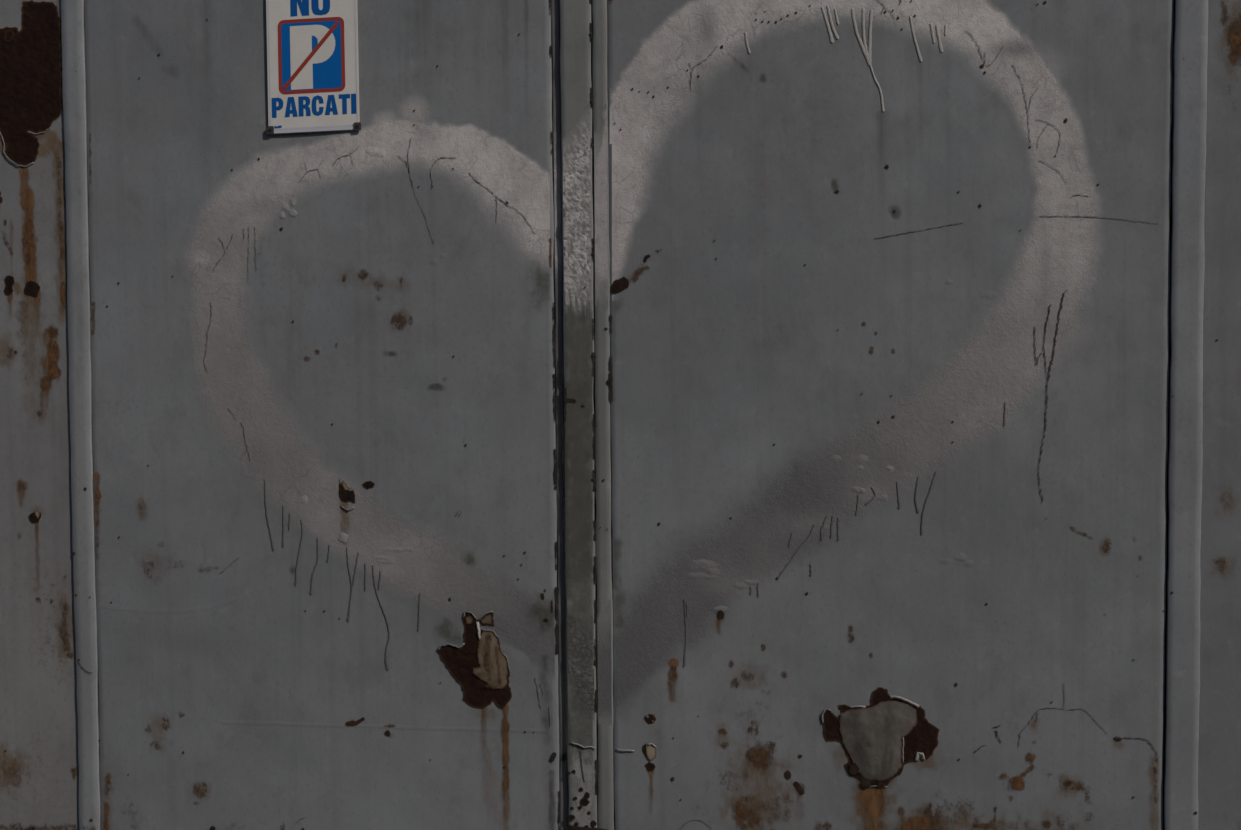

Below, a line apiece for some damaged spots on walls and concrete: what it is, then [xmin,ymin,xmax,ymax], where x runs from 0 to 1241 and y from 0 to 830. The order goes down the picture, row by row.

peeling [0,0,62,207]
corrosion [3,189,40,308]
corrosion [38,327,61,415]
peeling [473,614,508,689]
corrosion [501,705,510,818]
corrosion [746,721,775,769]
corrosion [776,770,805,816]
peeling [839,700,917,781]
corrosion [1000,753,1035,799]